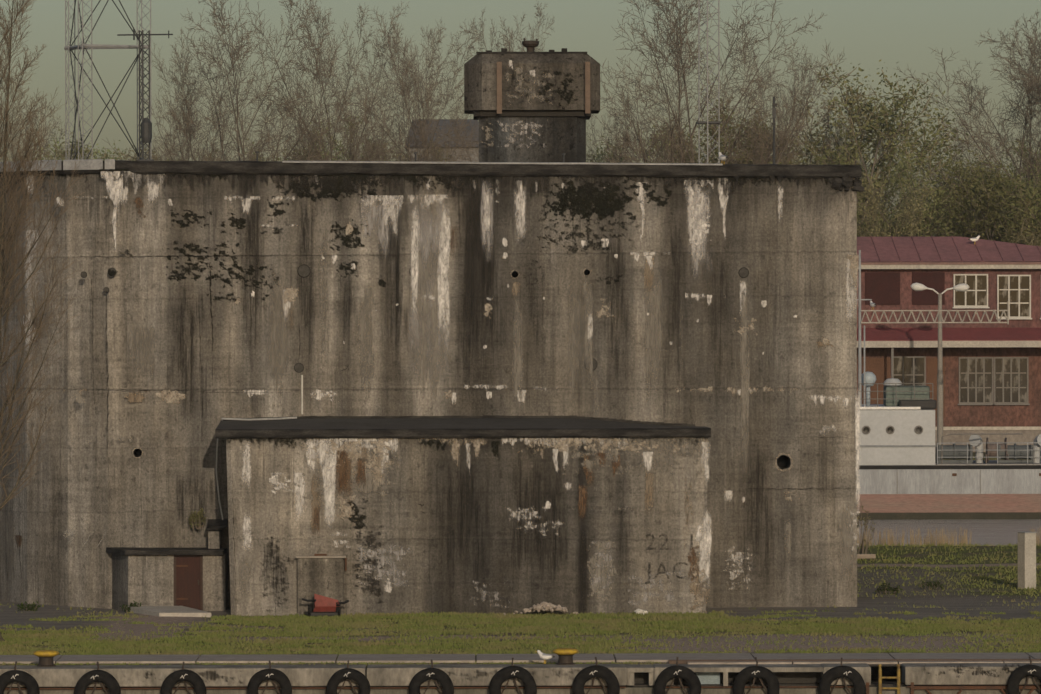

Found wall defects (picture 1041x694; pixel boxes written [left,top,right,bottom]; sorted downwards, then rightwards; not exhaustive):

damp [101,171,163,249]
damp [226,196,268,310]
damp [361,180,508,396]
damp [515,181,538,233]
damp [675,178,729,271]
damp [465,282,532,402]
spalling [155,390,185,404]
damp [242,445,250,480]
corrosion [335,448,367,496]
damp [502,437,709,511]
corrosion [688,546,701,581]
damp [695,513,712,585]